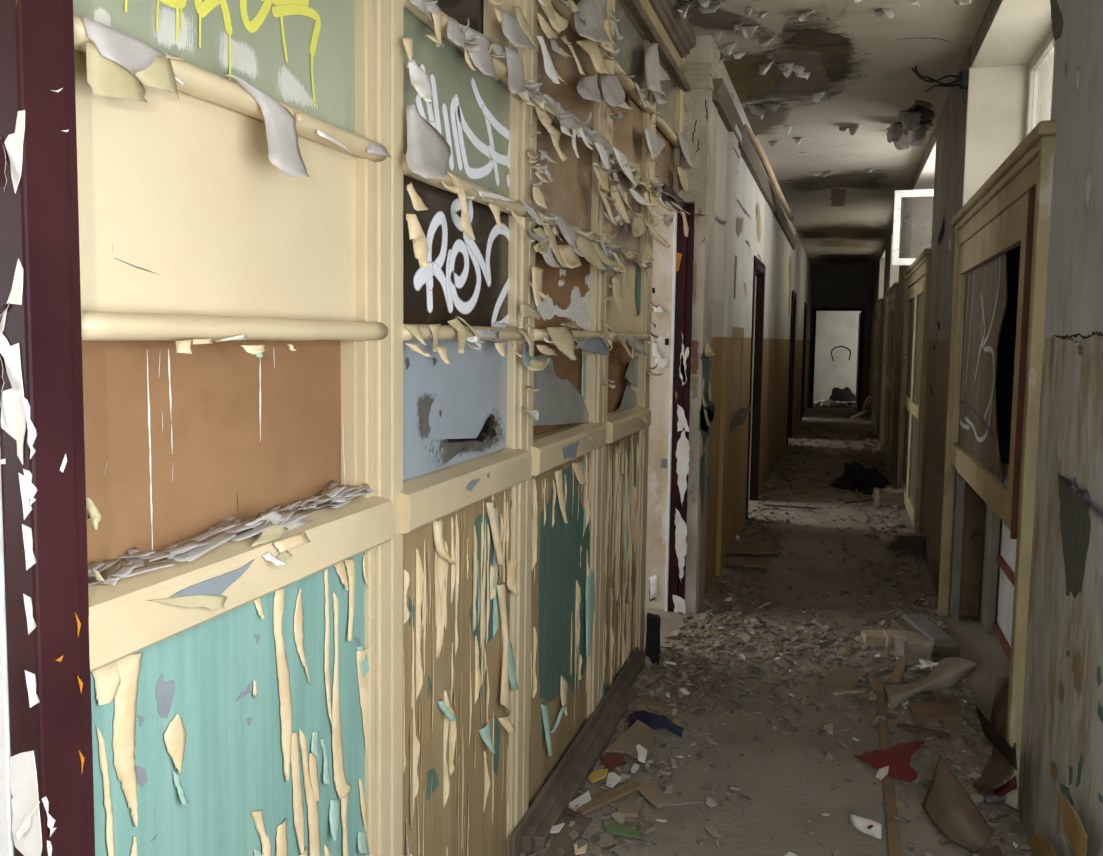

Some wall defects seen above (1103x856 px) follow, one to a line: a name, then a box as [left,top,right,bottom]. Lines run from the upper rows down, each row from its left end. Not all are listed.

peeling [224,75,310,177]
leakage [678,0,868,135]
peeling [0,259,38,571]
peeling [176,334,266,357]
peeling [402,0,716,580]
crack [1051,331,1103,368]
peeling [23,594,37,635]
peeling [24,670,40,708]
peeling [9,750,57,856]
peeling [77,652,143,856]
peeling [251,555,376,856]
peeling [403,434,657,856]